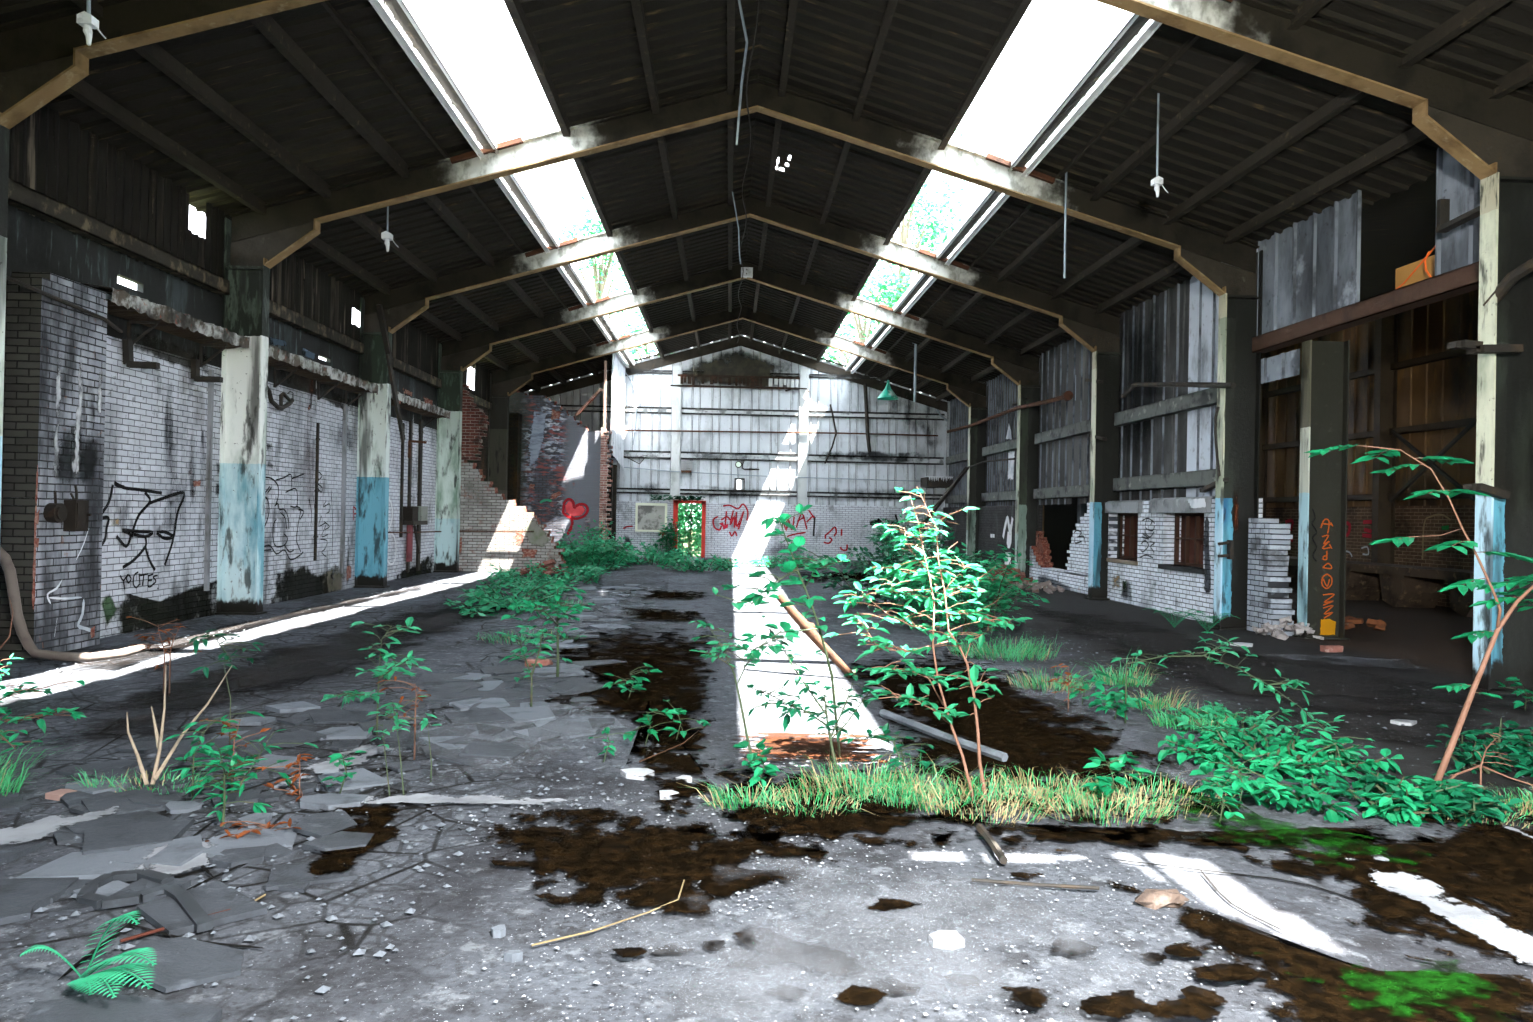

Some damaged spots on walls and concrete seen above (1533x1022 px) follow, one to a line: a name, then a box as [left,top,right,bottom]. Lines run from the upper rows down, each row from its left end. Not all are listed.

damp [102,581,217,636]
crack [186,822,248,890]
crack [58,915,264,980]